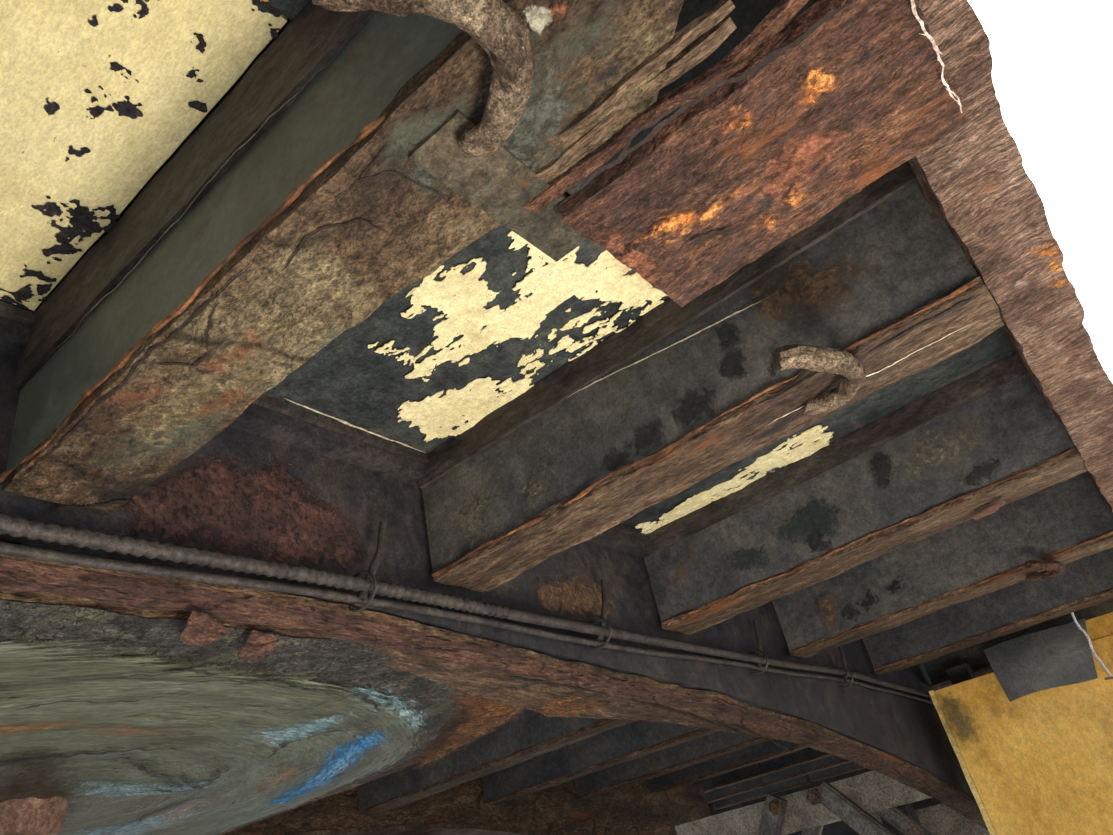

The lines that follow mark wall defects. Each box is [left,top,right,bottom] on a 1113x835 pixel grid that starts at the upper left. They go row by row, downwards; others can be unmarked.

peeling [84,62,143,119]
corrosion [800,68,834,103]
corrosion [911,0,962,113]
peeling [0,196,121,309]
corrosion [646,203,722,241]
peeling [368,231,667,442]
water stain [715,319,748,378]
corrosion [123,457,367,568]
water stain [603,388,715,471]
peeling [635,425,833,534]
water stain [778,499,839,553]
water stain [870,451,892,488]